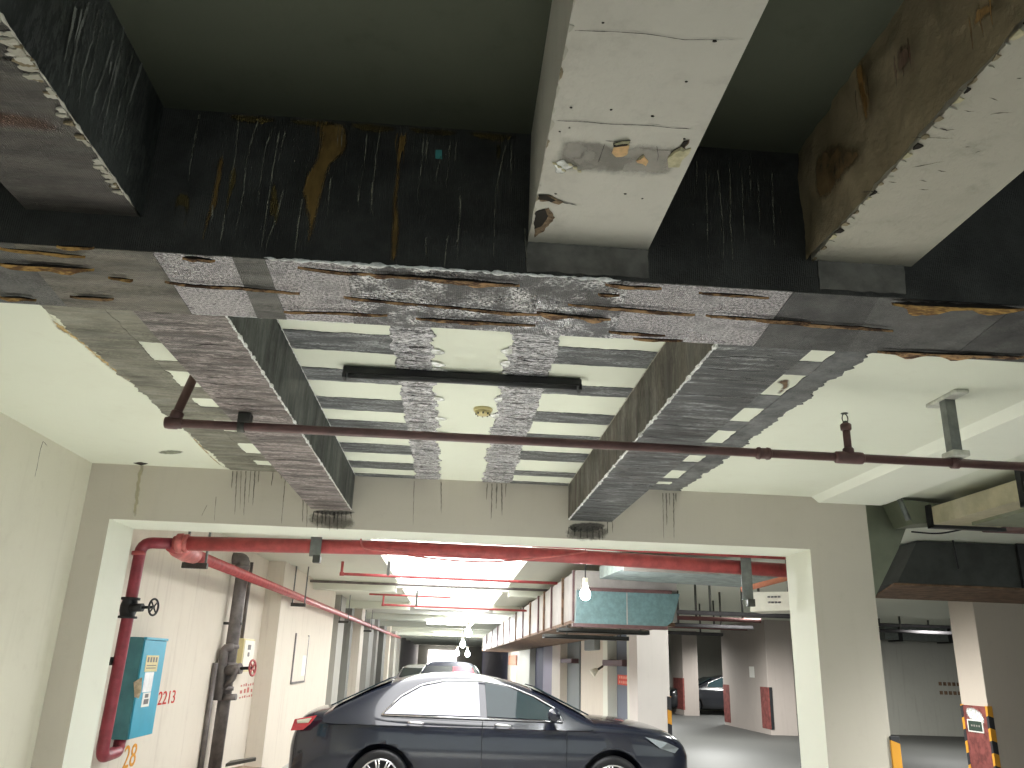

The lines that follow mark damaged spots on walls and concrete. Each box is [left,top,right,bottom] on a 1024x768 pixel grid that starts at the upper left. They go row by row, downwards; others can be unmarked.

spalling [0,18,124,195]
damp [211,115,396,246]
rust [304,120,347,235]
spalling [529,46,581,237]
peeling [612,140,648,166]
peeling [668,138,691,168]